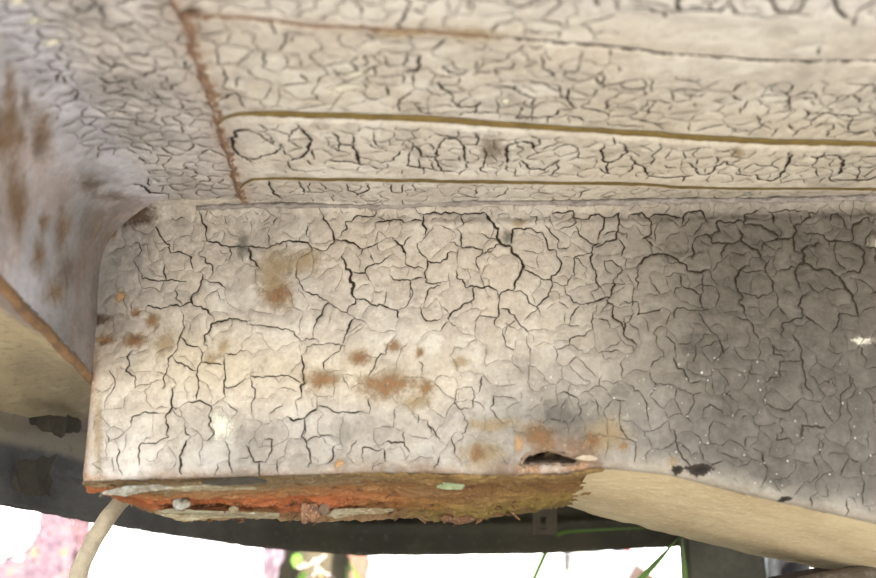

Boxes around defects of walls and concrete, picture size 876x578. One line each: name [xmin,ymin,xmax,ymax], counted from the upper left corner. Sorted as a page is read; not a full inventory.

crack [0,0,876,199]
corrosion [265,253,317,306]
crack [92,181,876,515]
corrosion [349,351,368,365]
corrosion [304,372,338,389]
corrosion [359,374,434,408]
peeling [102,485,257,497]
peeling [437,482,464,490]
peeling [155,508,279,522]
corrosion [300,502,330,524]
peeling [326,508,394,519]
corrosion [441,513,476,525]